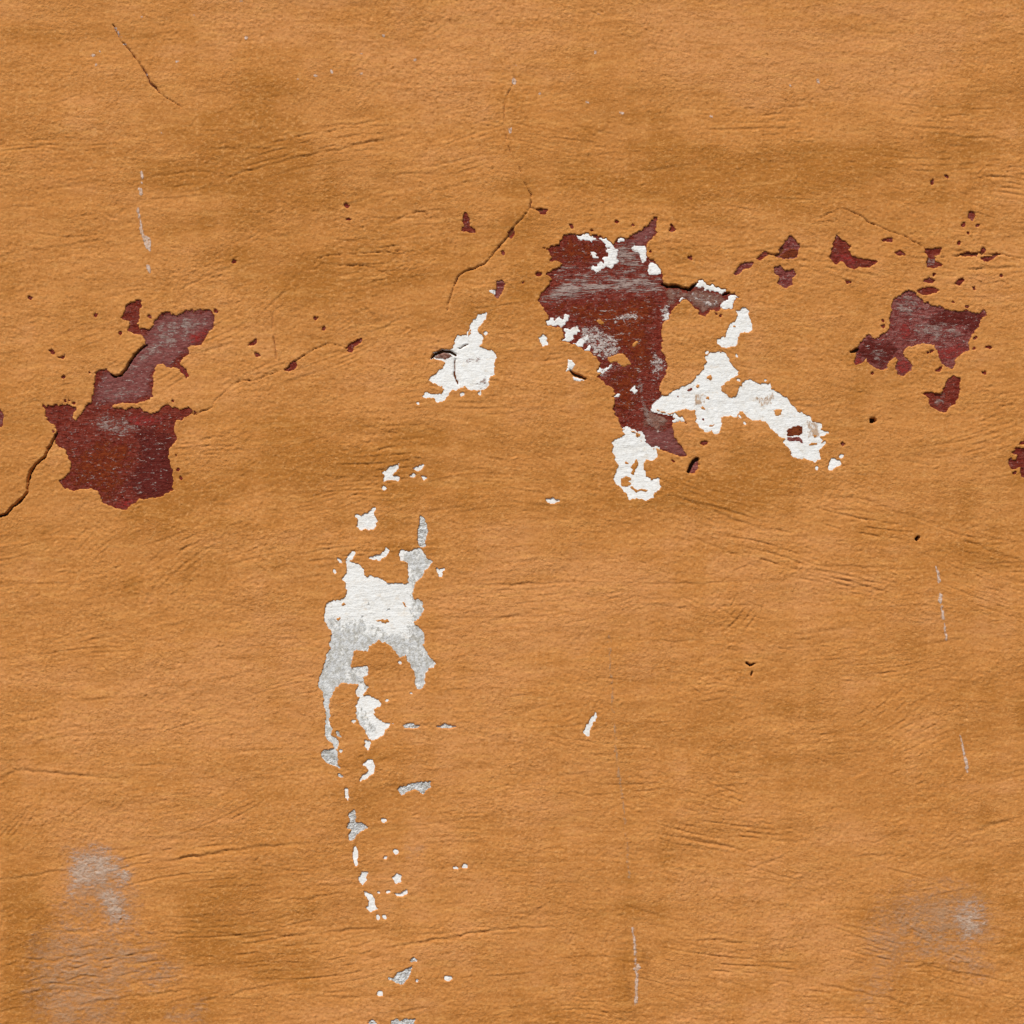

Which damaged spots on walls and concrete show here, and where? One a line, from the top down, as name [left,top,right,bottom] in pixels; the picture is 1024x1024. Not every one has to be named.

crack [113,25,160,93]
crack [451,193,548,295]
peeling [830,235,877,269]
peeling [43,300,218,510]
peeling [417,312,497,405]
peeling [538,217,844,501]
peeling [854,290,987,412]
crack [0,436,57,517]
peeling [355,507,378,530]
peeling [1008,441,1024,478]
peeling [318,516,445,920]
peeling [388,957,418,985]